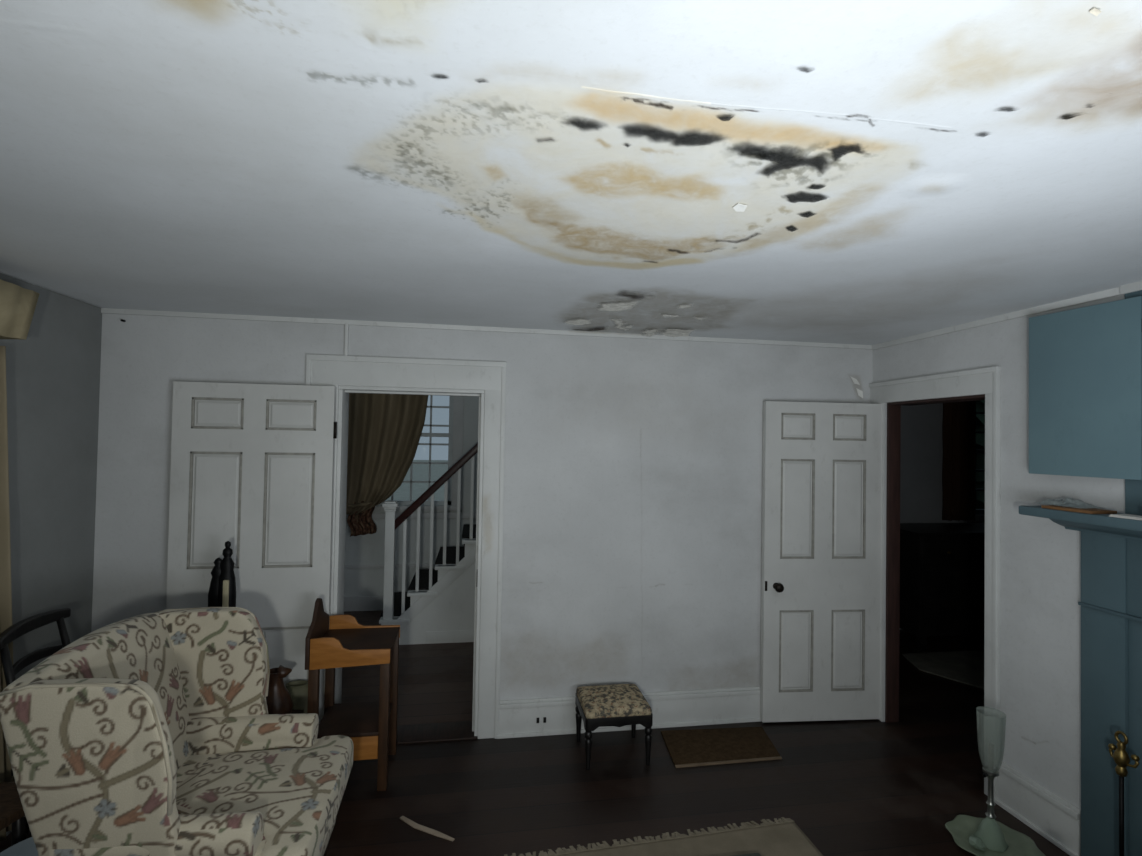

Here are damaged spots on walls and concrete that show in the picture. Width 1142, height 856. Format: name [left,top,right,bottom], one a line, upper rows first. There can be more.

leakage [568,119,601,130]
leakage [624,126,722,147]
leakage [735,146,863,232]
peeling [565,295,702,337]